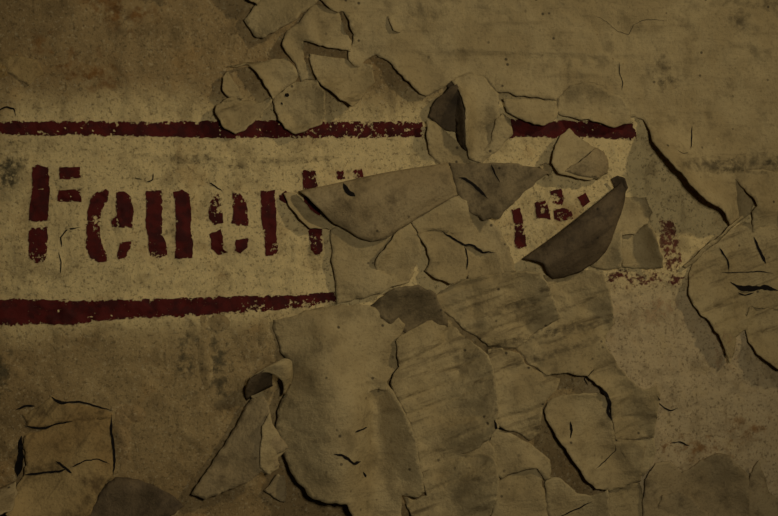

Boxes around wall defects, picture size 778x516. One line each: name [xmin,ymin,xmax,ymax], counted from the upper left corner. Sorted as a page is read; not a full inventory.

peeling [0,396,184,516]
peeling [191,0,778,516]